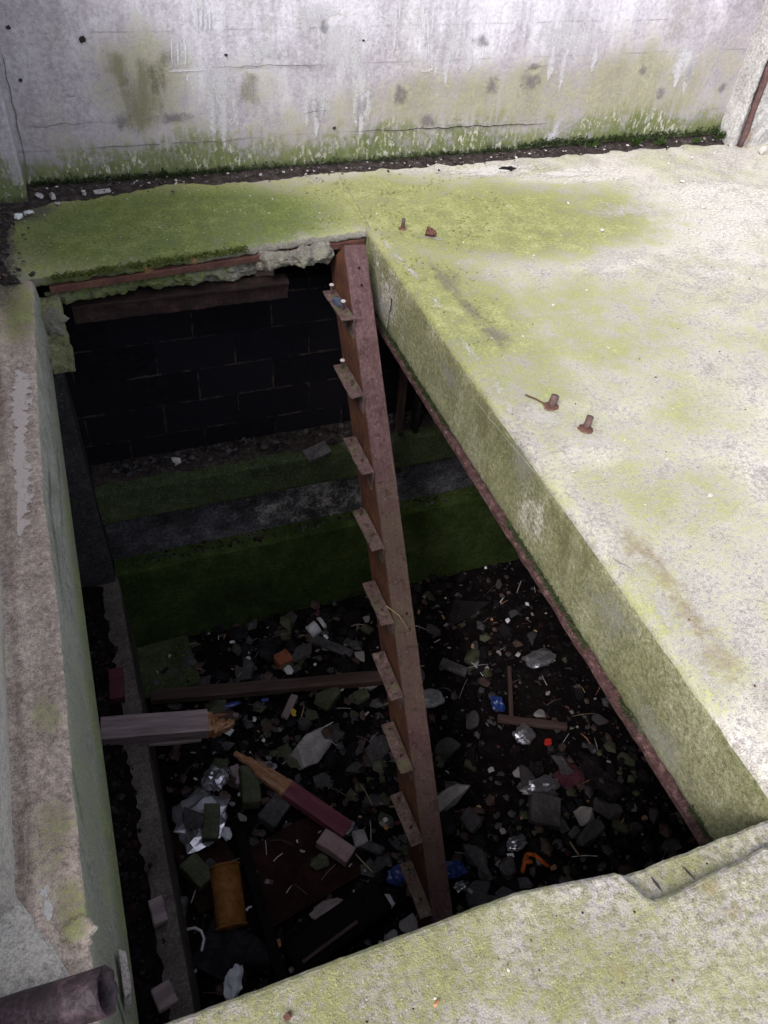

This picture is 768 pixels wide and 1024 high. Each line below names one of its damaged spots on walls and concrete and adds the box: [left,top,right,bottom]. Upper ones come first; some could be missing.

crack [363,123,546,137]
spalling [41,241,334,337]